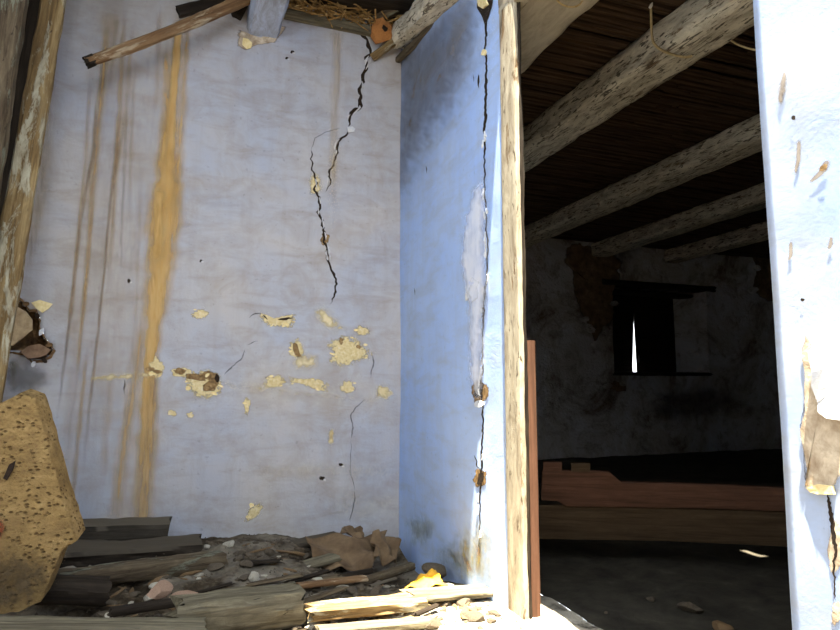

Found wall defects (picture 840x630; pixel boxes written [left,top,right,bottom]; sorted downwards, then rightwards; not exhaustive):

crack [310,35,374,303]
corrosion [117,34,187,517]
crack [472,0,493,547]
spalling [10,298,56,367]
peeling [260,313,296,327]
peeling [320,310,372,367]
peeling [143,356,223,398]
peeling [263,375,329,392]
peeling [800,335,840,494]